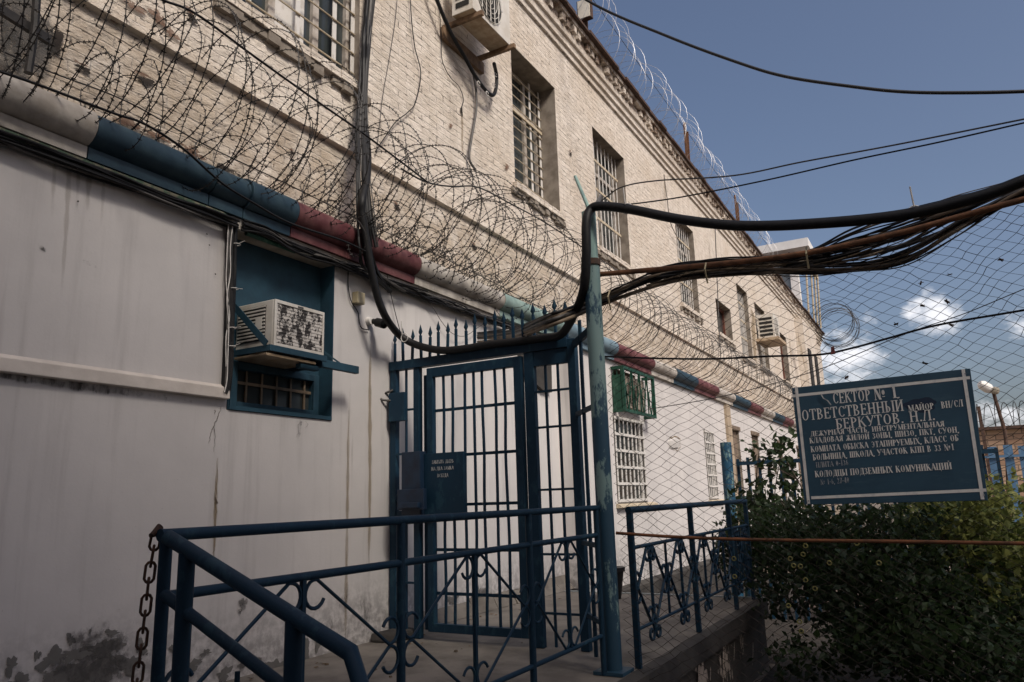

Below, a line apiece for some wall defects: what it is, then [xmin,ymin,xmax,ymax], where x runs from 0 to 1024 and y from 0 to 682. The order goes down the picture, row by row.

damp [1,374,123,393]
crack [209,409,221,555]